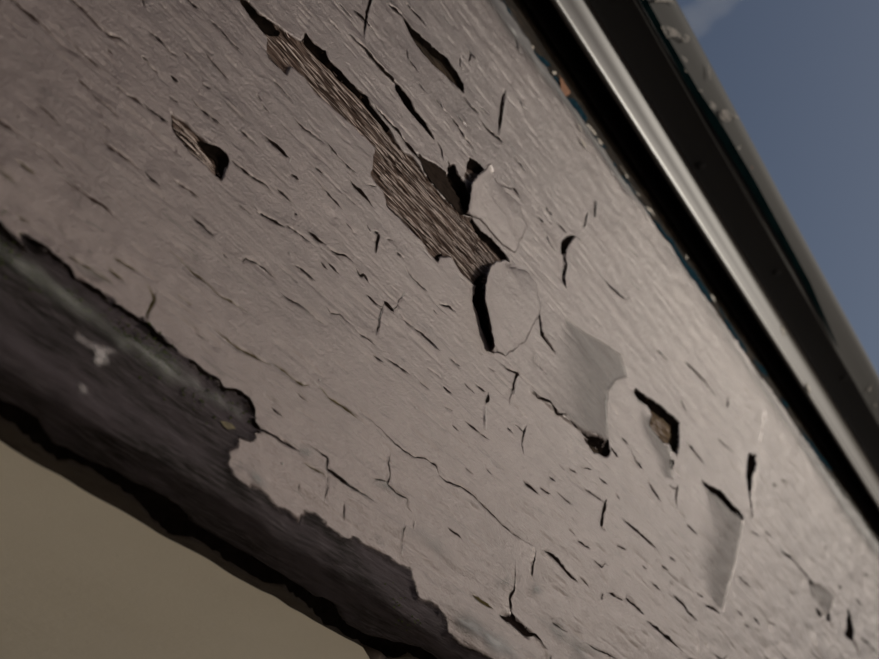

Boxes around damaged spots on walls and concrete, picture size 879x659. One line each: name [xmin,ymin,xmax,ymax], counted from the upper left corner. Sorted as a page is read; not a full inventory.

peeling [171,114,229,179]
peeling [240,0,541,356]
crack [537,194,597,285]
peeling [503,0,879,544]
peeling [0,210,492,659]
crack [195,328,683,659]
crack [611,438,698,535]
crack [523,467,786,659]
crack [657,350,729,408]
peeling [702,454,757,609]
crack [752,531,810,584]
peeling [844,611,854,641]